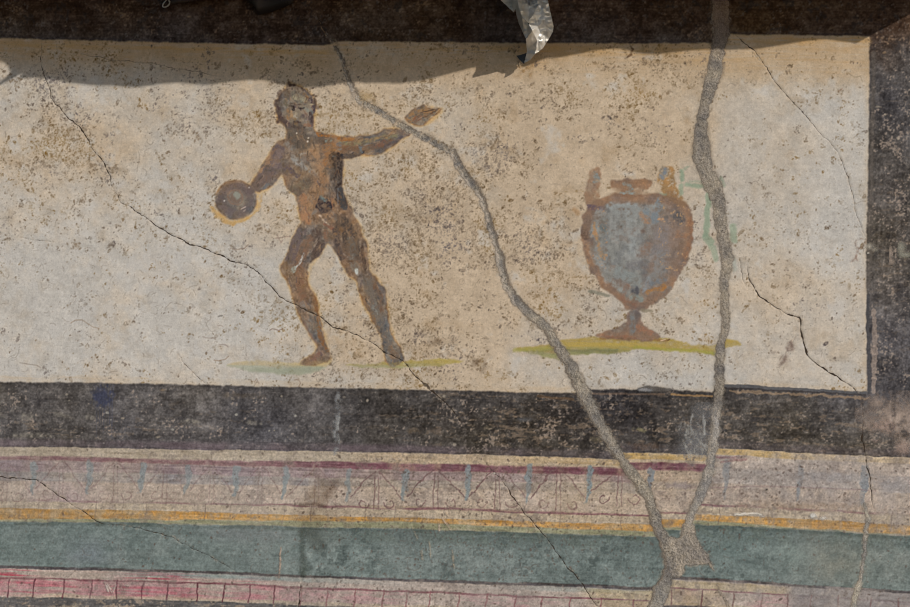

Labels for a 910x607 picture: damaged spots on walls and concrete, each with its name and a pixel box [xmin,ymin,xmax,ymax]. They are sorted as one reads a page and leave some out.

crack [318,0,855,607]
crack [0,476,103,524]
crack [851,412,872,607]